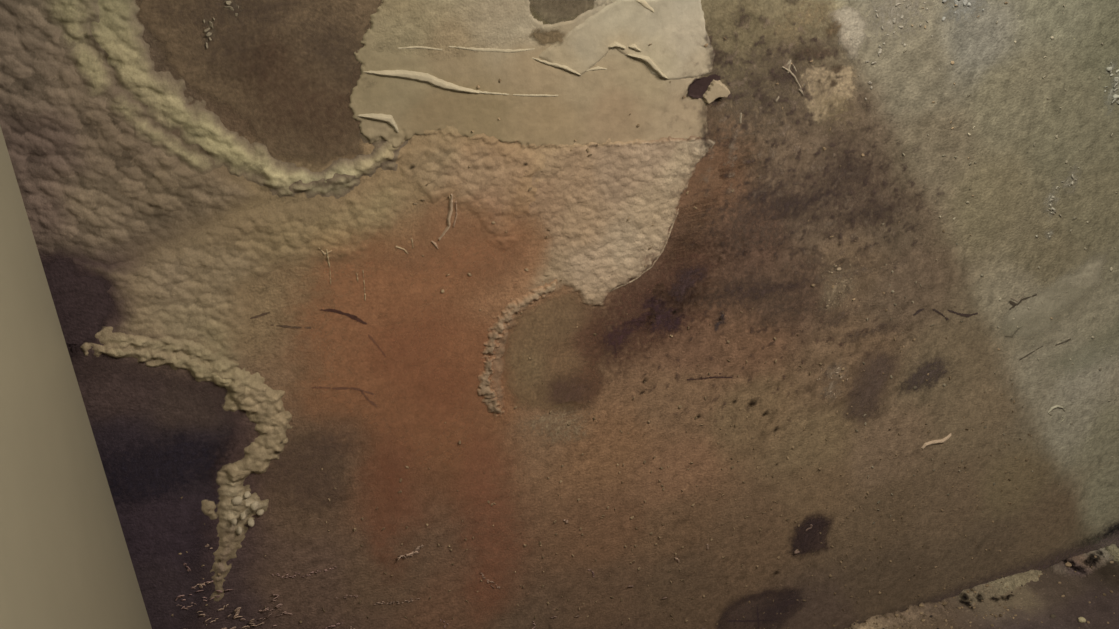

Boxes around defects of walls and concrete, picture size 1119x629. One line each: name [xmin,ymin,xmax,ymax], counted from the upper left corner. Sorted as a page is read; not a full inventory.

peeling [349,0,730,254]
leakage [505,0,918,442]
leakage [905,358,947,390]
leakage [792,516,831,554]
peeling [175,581,293,629]
leakage [718,591,799,629]